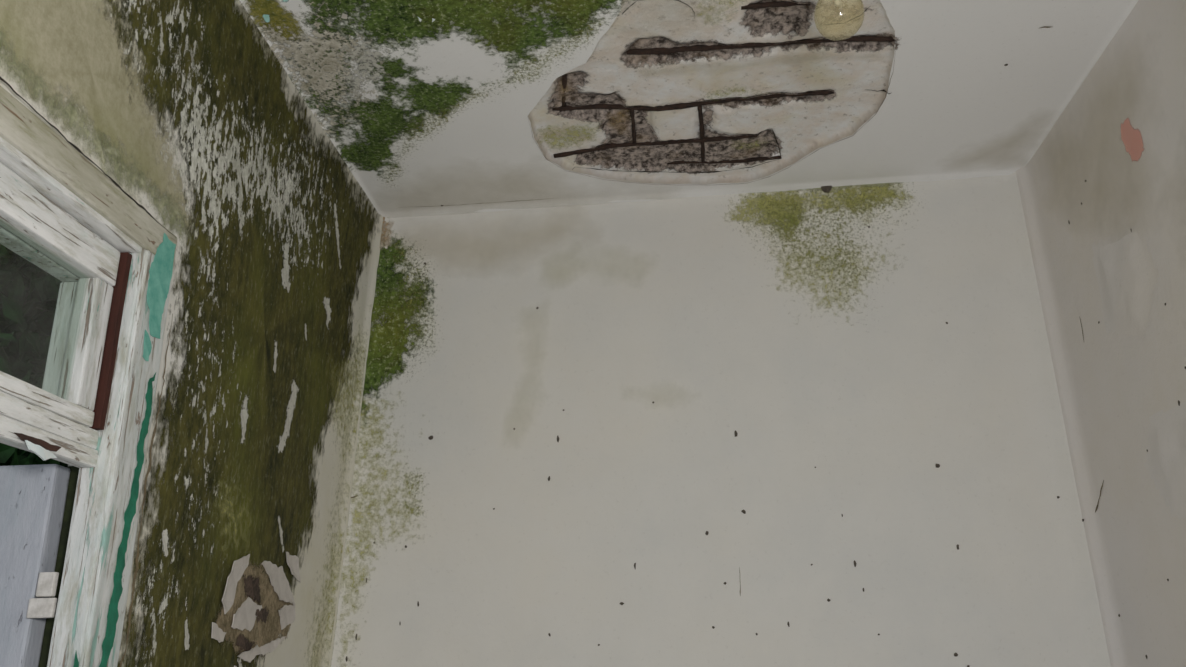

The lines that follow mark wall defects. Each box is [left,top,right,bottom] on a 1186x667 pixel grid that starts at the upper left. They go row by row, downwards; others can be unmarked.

flaking render [0,0,398,667]
damp [0,0,625,667]
spalling [528,0,899,185]
damp [731,182,911,306]